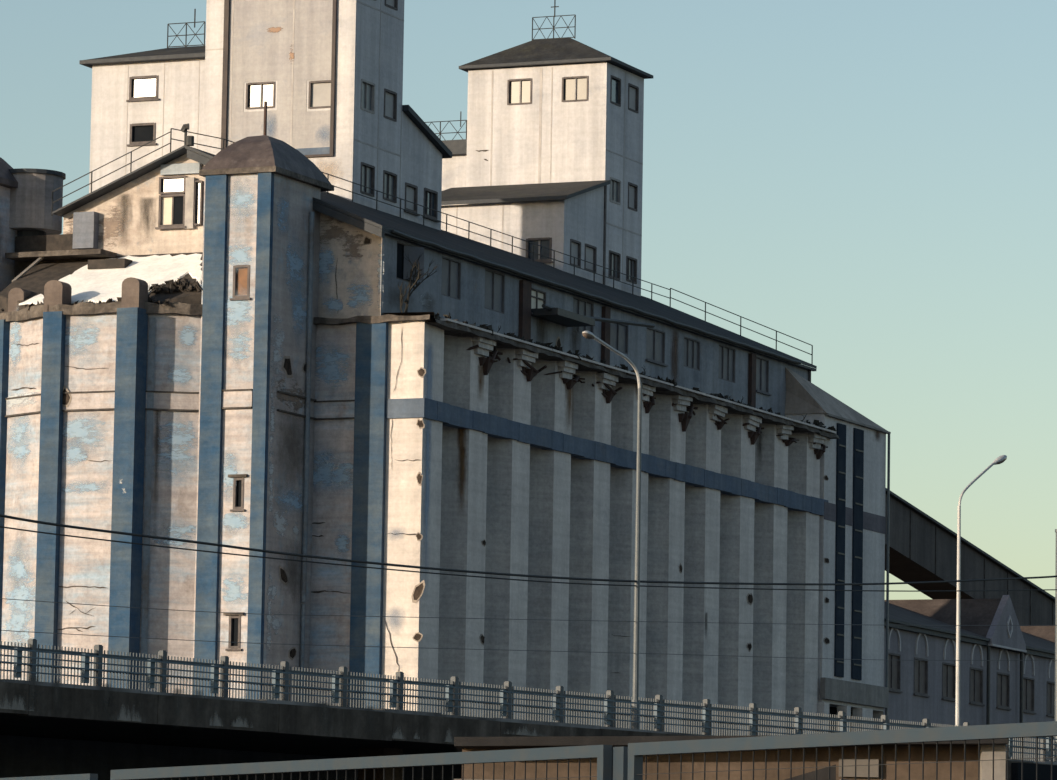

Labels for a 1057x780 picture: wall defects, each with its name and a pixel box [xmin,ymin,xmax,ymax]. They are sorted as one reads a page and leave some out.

crack [58,586,106,632]